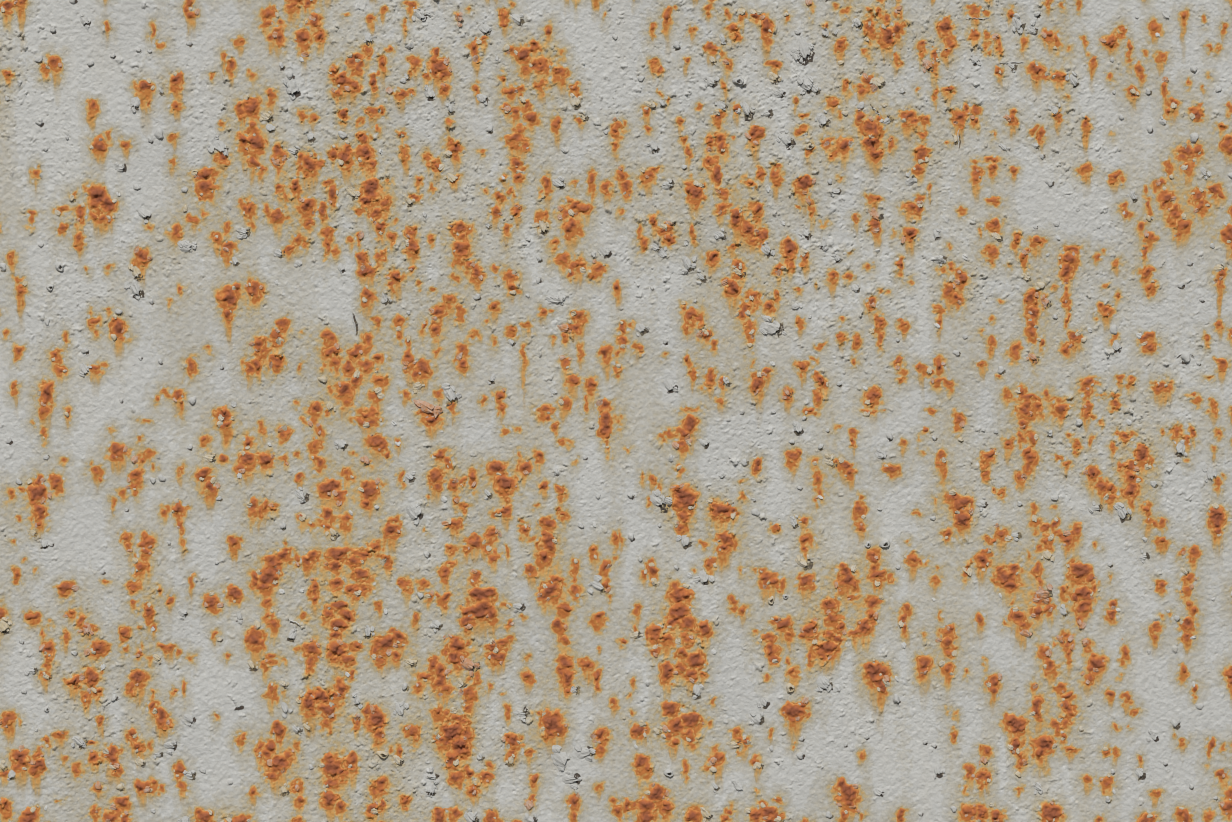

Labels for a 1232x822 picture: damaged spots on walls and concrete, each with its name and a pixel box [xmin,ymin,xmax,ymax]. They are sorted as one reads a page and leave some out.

rust [0,0,786,822]
rust [639,299,1143,822]
rust [635,0,1232,704]
rust [1172,729,1190,752]
rust [1135,736,1232,822]